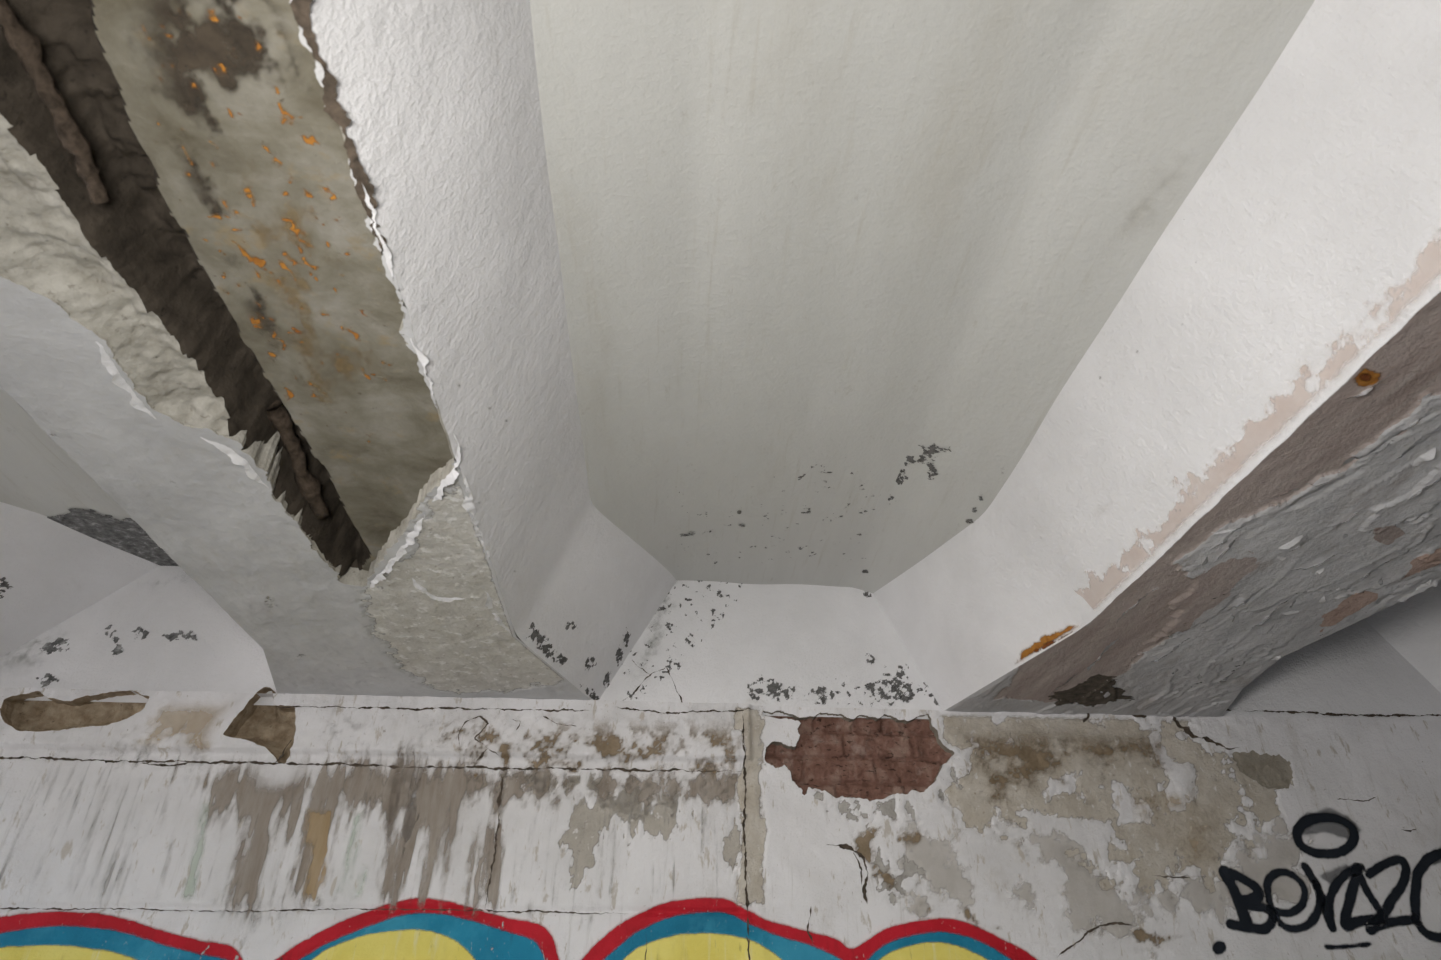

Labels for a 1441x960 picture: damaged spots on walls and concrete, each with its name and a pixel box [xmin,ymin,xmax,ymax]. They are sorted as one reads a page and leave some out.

spalling [0,0,564,694]
rust [1354,369,1381,387]
peeling [703,241,1441,938]
rust [1020,626,1074,660]
hole [0,691,149,732]
flaking render [223,687,296,764]
peeling [502,770,694,888]